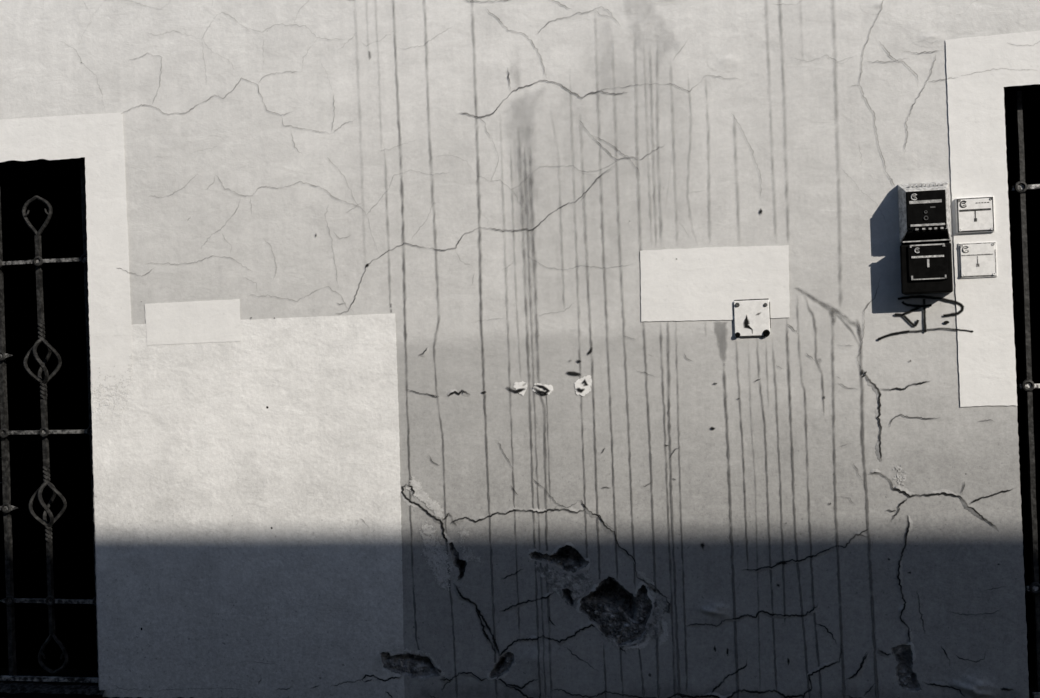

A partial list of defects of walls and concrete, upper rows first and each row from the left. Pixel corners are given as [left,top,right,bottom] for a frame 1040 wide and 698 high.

crack [462,0,622,118]
crack [860,41,945,144]
peeling [513,381,553,396]
peeling [574,375,592,397]
leakage [479,234,496,663]
flaking render [527,542,590,573]
flaking render [562,571,670,650]
leakage [661,339,687,695]
crack [400,291,1011,698]
leakage [723,333,822,698]
leakage [861,375,879,698]
crack [285,673,401,697]